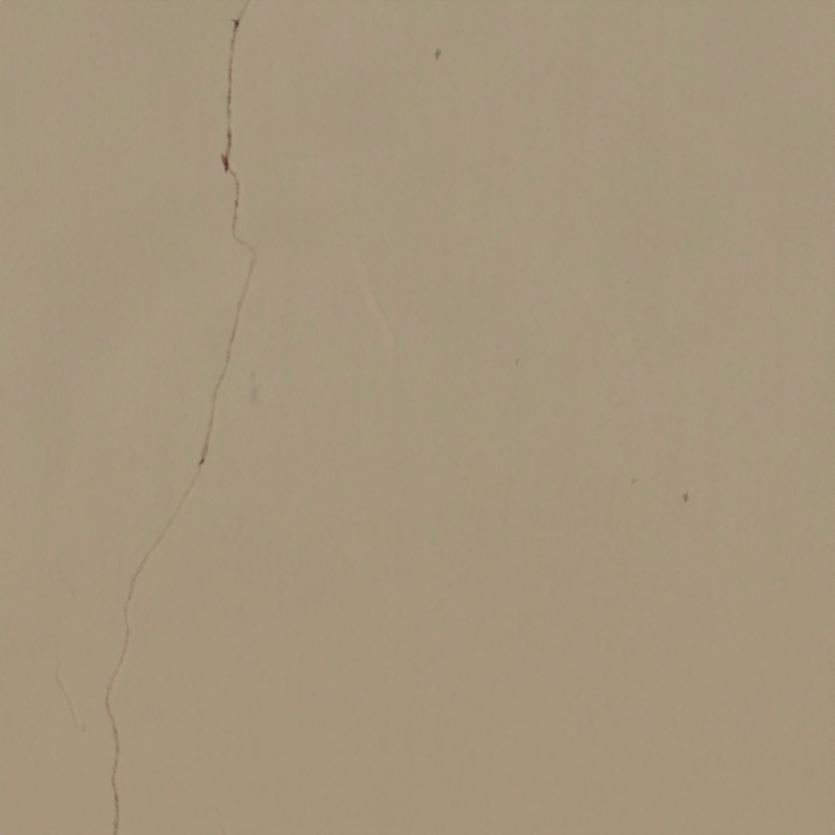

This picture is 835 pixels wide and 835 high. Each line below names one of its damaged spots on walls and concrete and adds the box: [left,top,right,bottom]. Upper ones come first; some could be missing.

crack [104,0,261,835]